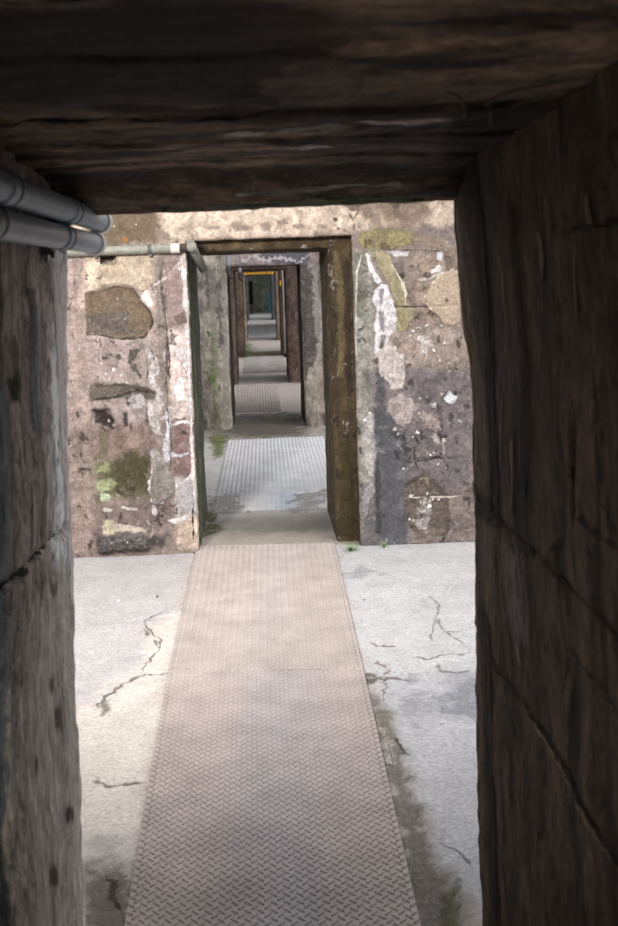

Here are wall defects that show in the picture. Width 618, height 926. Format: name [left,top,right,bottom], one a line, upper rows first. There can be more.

spalling [85,256,156,401]
peeling [165,267,188,368]
peeling [424,270,462,326]
peeling [375,342,446,442]
spalling [401,473,450,538]
water stain [0,312,12,828]
crack [0,531,59,616]
spalling [23,259,131,926]
crack [409,485,618,638]
crack [96,611,168,714]
crack [97,780,143,788]
crack [365,595,618,872]